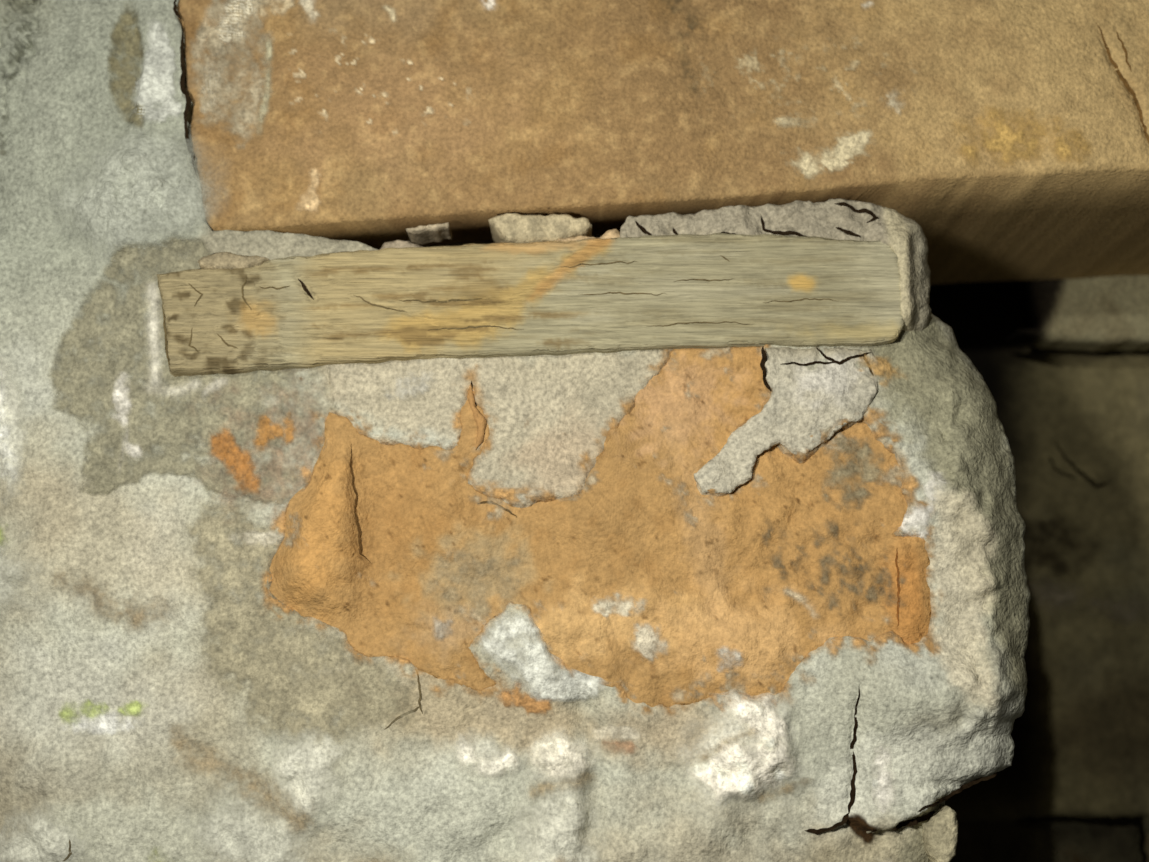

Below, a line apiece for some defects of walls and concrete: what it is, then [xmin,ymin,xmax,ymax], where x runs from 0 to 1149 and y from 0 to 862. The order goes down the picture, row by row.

crack [1096,21,1149,143]
crack [782,347,873,375]
spalling [212,416,293,489]
spalling [264,344,938,713]
crack [804,690,860,834]